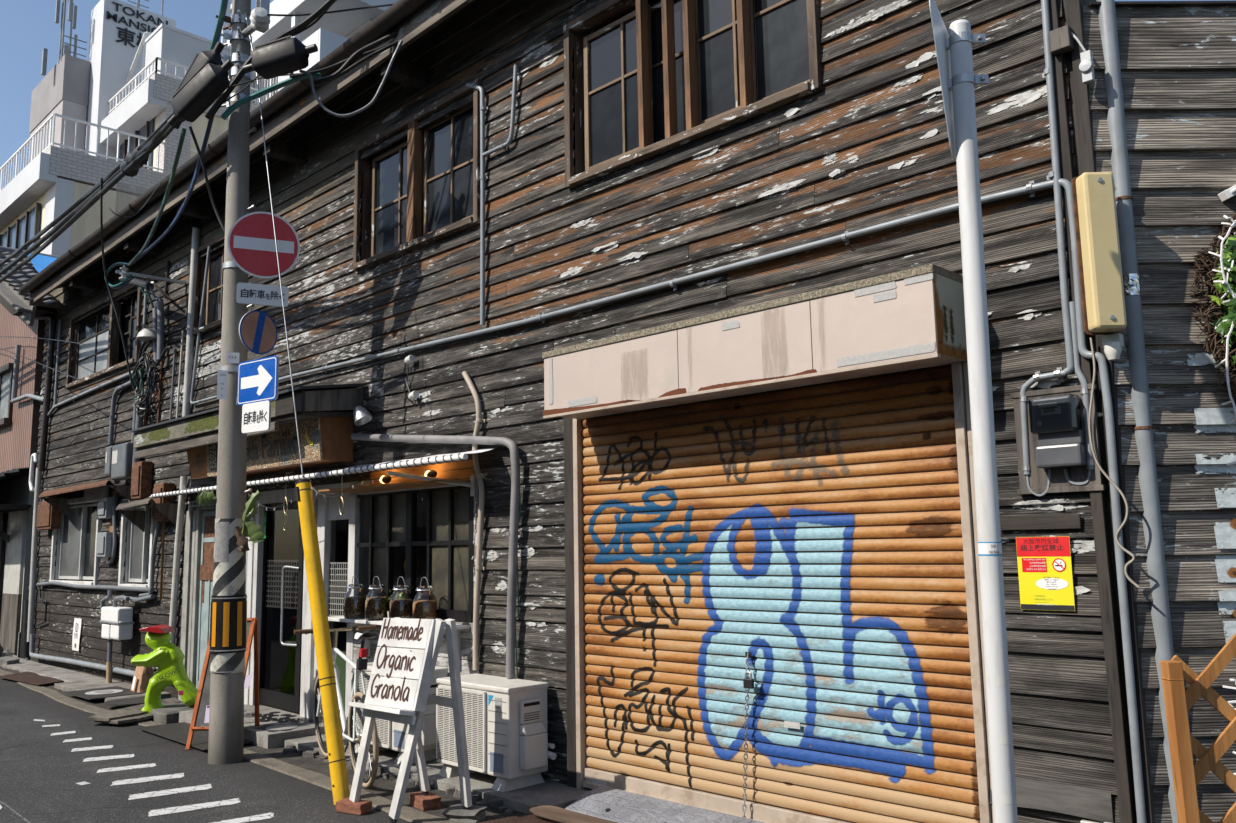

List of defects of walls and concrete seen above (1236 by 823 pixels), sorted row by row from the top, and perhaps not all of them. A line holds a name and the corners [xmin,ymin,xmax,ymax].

peeling [823,0,911,38]
peeling [894,50,942,100]
peeling [986,85,1047,115]
peeling [822,152,859,178]
peeling [888,158,918,170]
peeling [757,179,806,199]
peeling [591,242,648,266]
peeling [173,340,221,405]
peeling [1194,408,1236,433]
rust [906,517,953,538]
peeling [1194,453,1236,643]
rust [925,601,968,633]